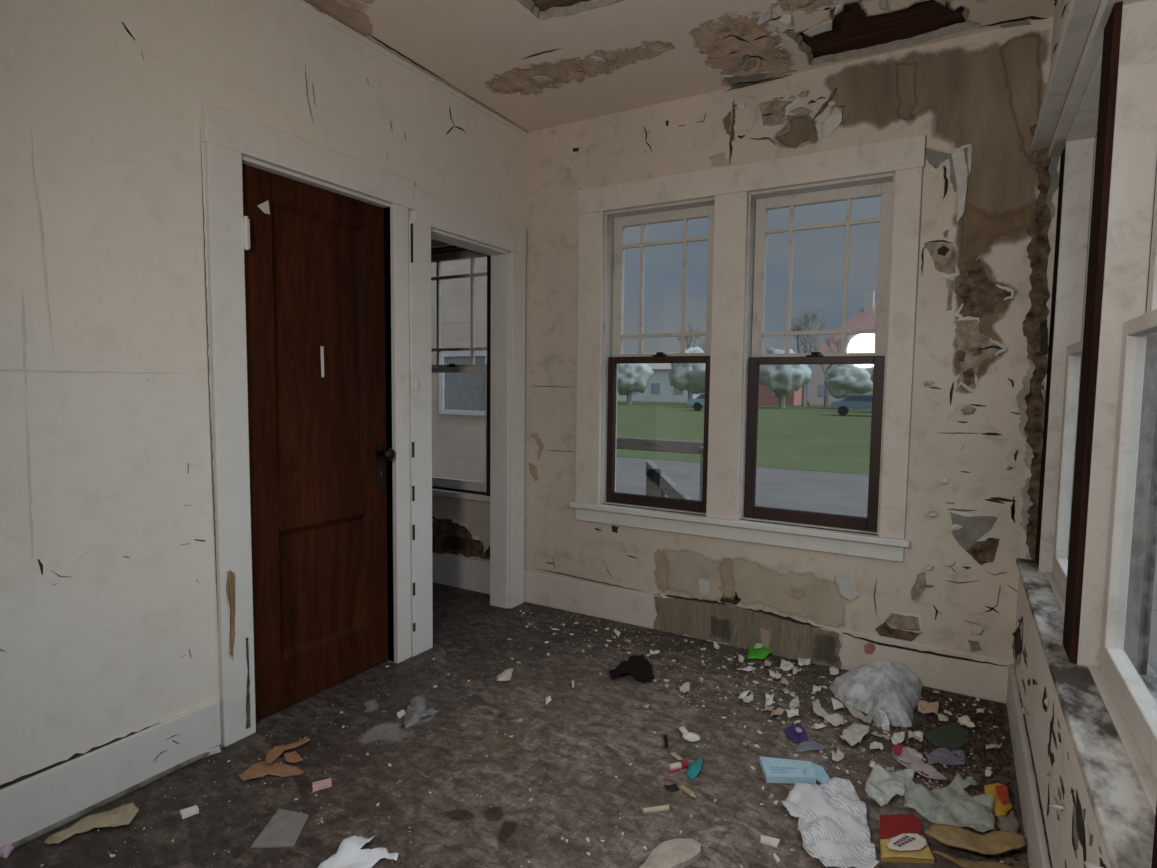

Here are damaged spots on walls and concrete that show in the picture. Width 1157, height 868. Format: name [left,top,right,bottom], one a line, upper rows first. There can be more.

flaking render [517,0,624,20]
peeling [486,41,674,95]
flaking render [690,0,982,88]
peeling [733,87,847,148]
flaking render [875,123,1059,641]
peeling [654,550,859,670]
crack [0,715,179,789]
peeling [1012,616,1106,868]